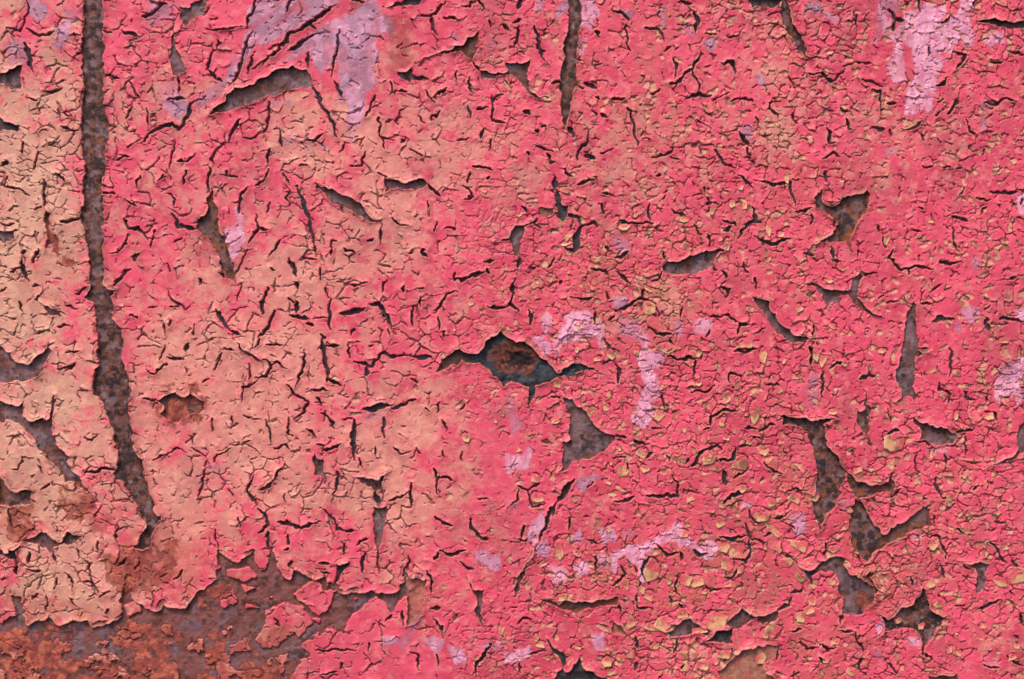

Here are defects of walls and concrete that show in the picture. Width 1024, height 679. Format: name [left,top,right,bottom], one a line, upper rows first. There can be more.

crack [2,3,167,224]
peeling [208,62,314,115]
crack [804,166,1023,304]
crack [105,0,896,624]
peeling [0,396,94,497]
corrosion [156,382,207,425]
corrosion [0,619,185,679]
corrosion [101,539,181,595]
peeling [0,549,426,679]
corrosion [197,631,241,679]
crack [403,497,488,665]
peeling [751,410,949,655]